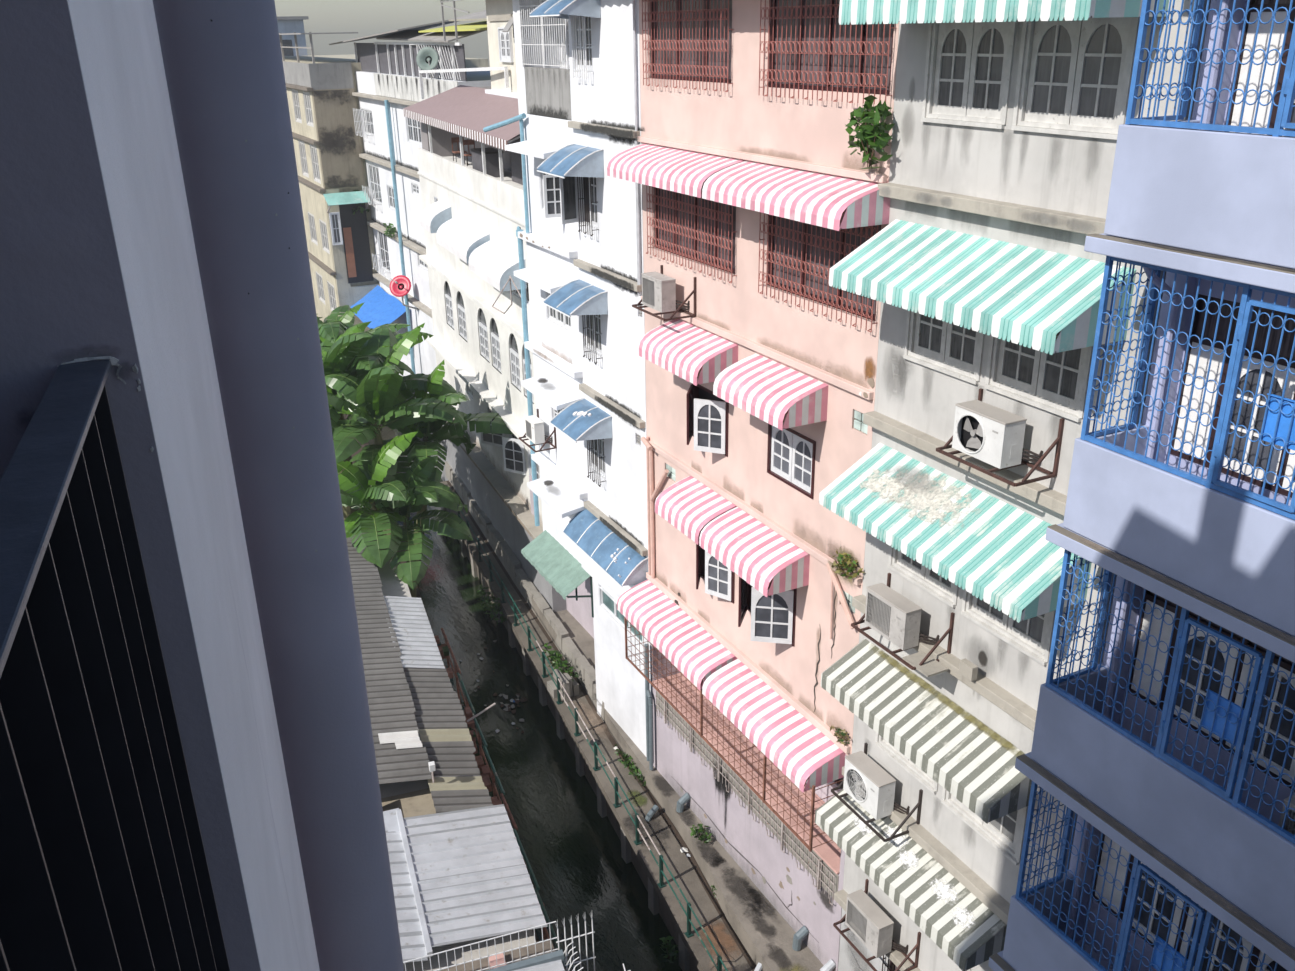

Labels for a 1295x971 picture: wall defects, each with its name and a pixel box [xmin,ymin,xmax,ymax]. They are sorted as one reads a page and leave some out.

spalling [57,356,127,384]
crack [814,592,837,712]
leakage [713,767,731,819]